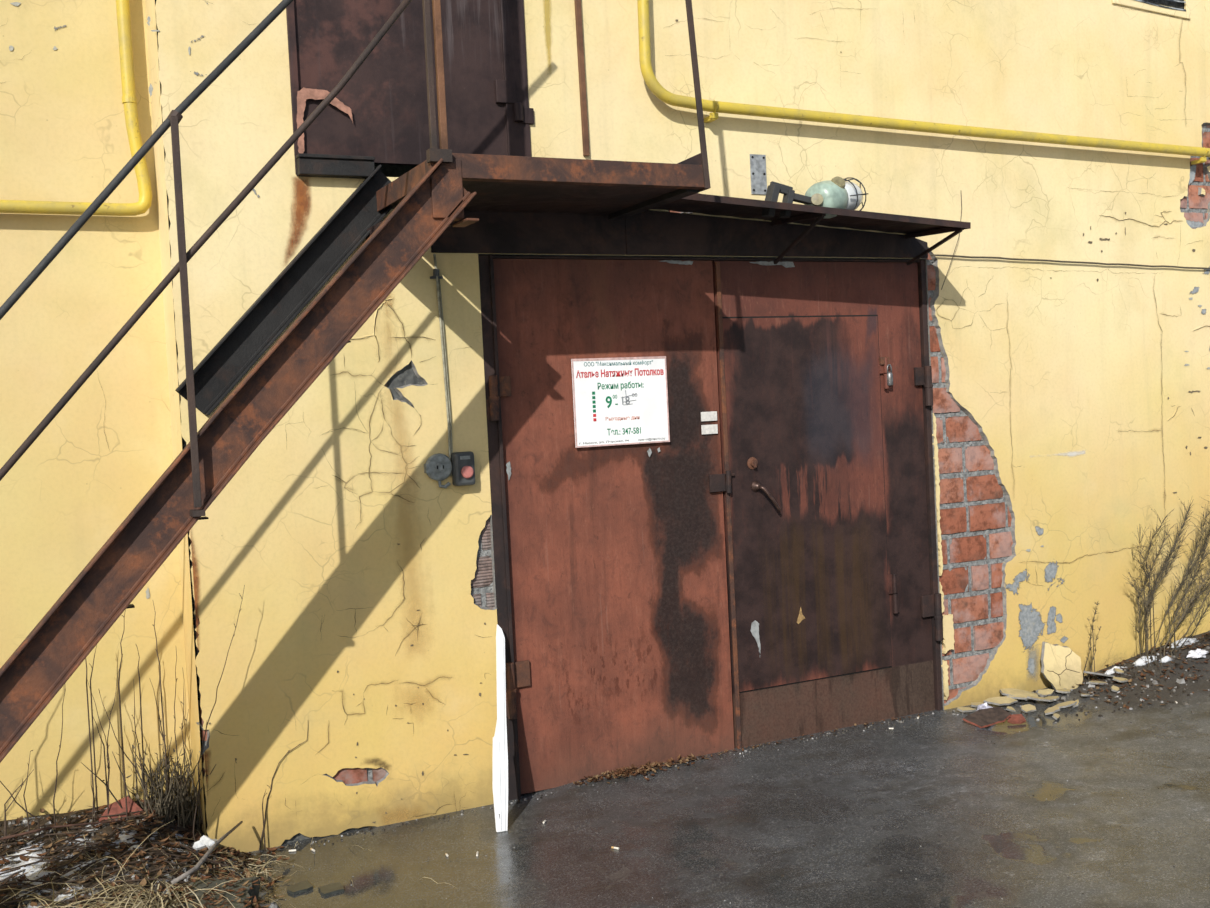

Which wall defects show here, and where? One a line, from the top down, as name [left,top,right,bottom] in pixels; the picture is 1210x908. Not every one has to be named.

corrosion [287,178,310,256]
spalling [1180,122,1210,229]
peeling [1189,267,1210,315]
spalling [384,360,428,408]
corrosion [191,542,199,645]
crack [286,298,444,752]
spalling [471,518,496,625]
spalling [919,247,1068,706]
spalling [323,742,389,794]